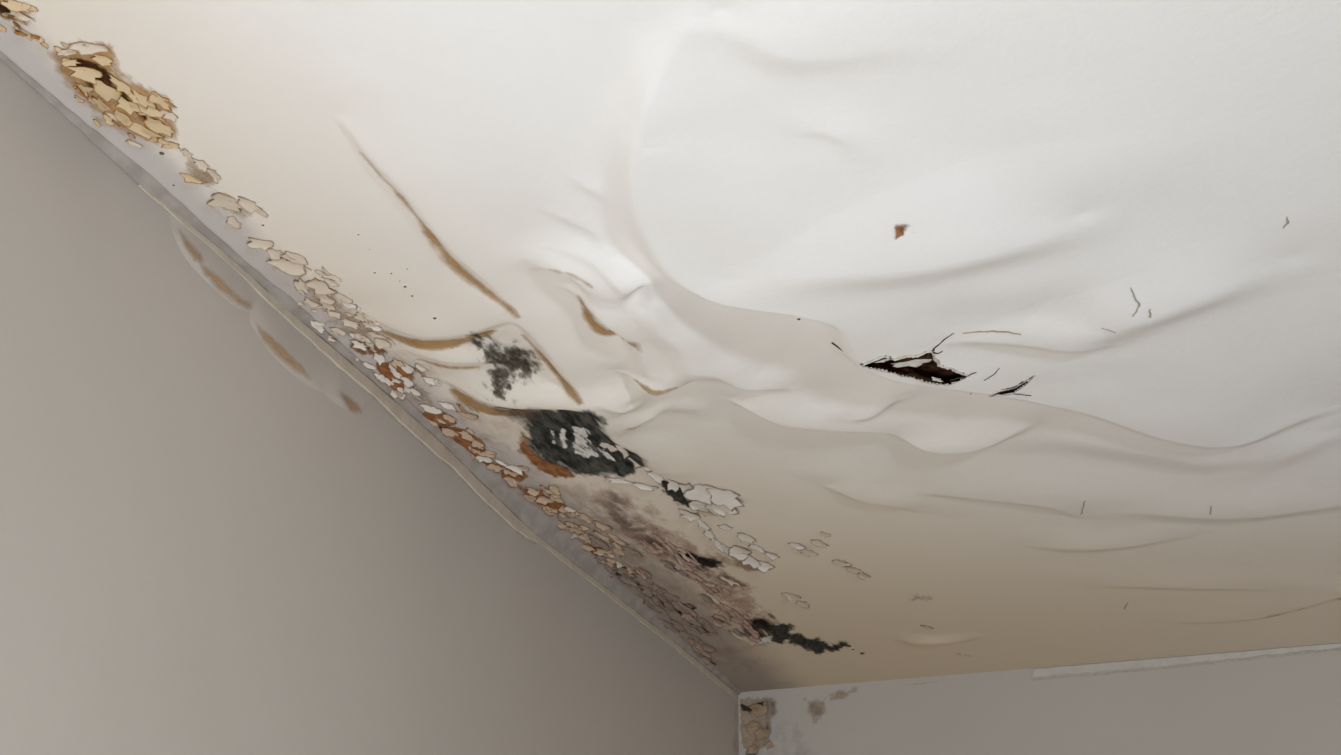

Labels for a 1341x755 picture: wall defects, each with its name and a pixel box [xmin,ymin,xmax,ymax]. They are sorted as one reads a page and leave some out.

damp [422,224,518,317]
peeling [0,0,871,665]
damp [580,300,635,347]
crack [962,329,1021,337]
damp [382,331,645,478]
damp [676,553,735,585]
damp [743,614,864,654]
flaking render [740,699,776,755]